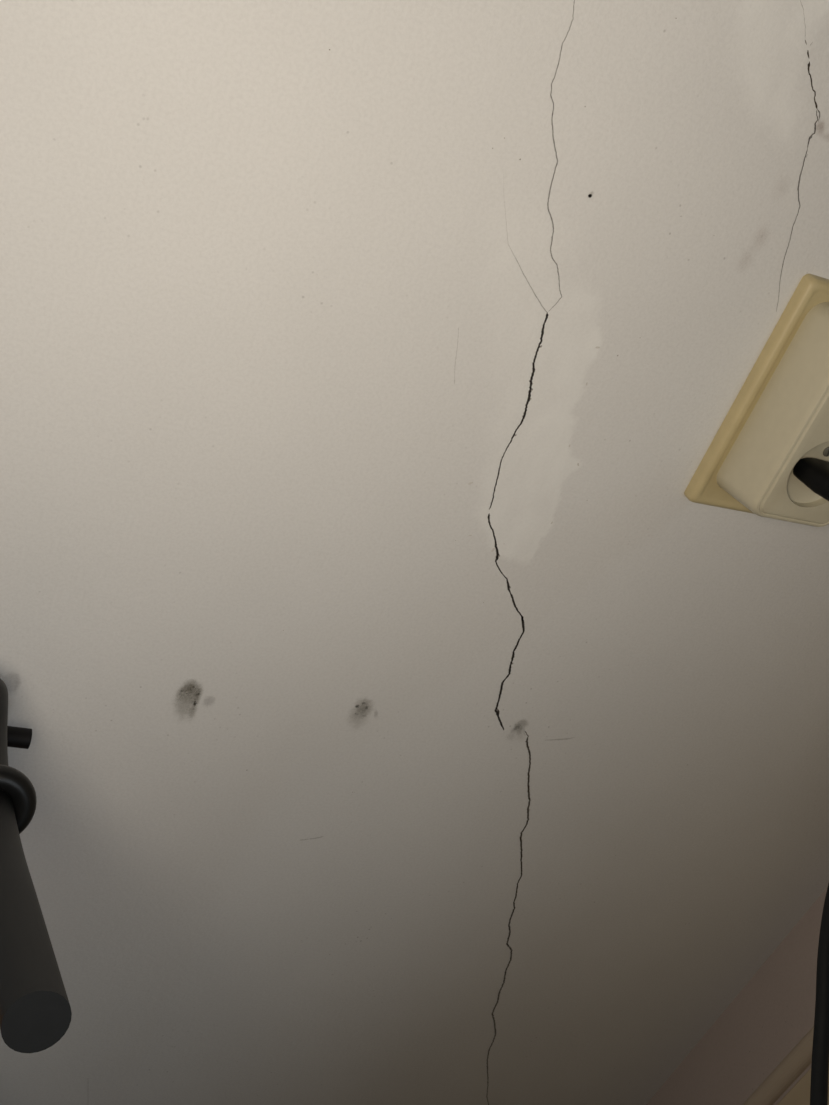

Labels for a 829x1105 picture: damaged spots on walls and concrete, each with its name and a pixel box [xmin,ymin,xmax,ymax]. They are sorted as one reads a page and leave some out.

crack [486,1,575,1105]
crack [777,40,820,306]